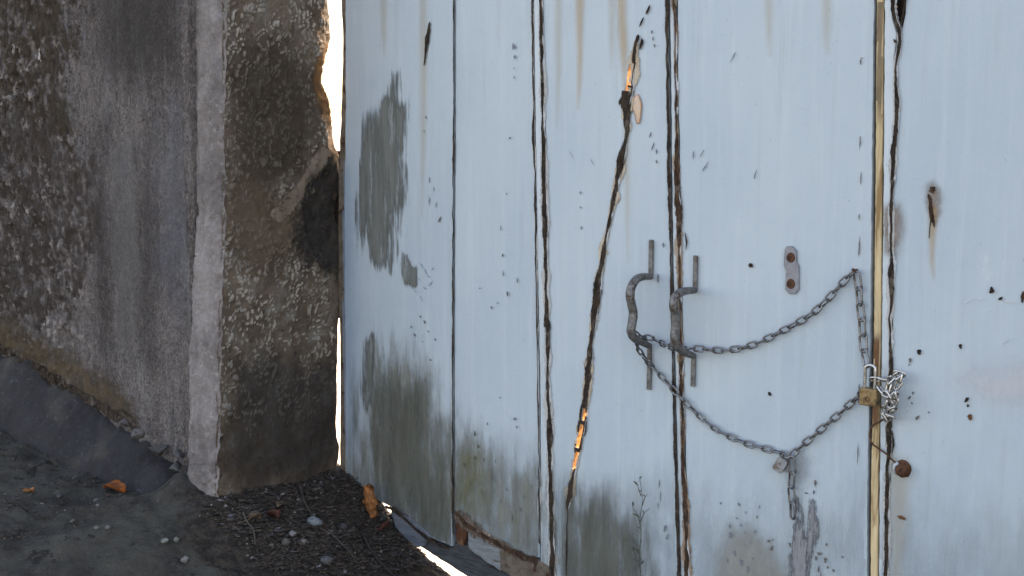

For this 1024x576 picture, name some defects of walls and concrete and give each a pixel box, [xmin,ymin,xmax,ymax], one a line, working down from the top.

water stain [373,382,444,535]
crack [531,0,693,576]
crack [882,0,906,576]